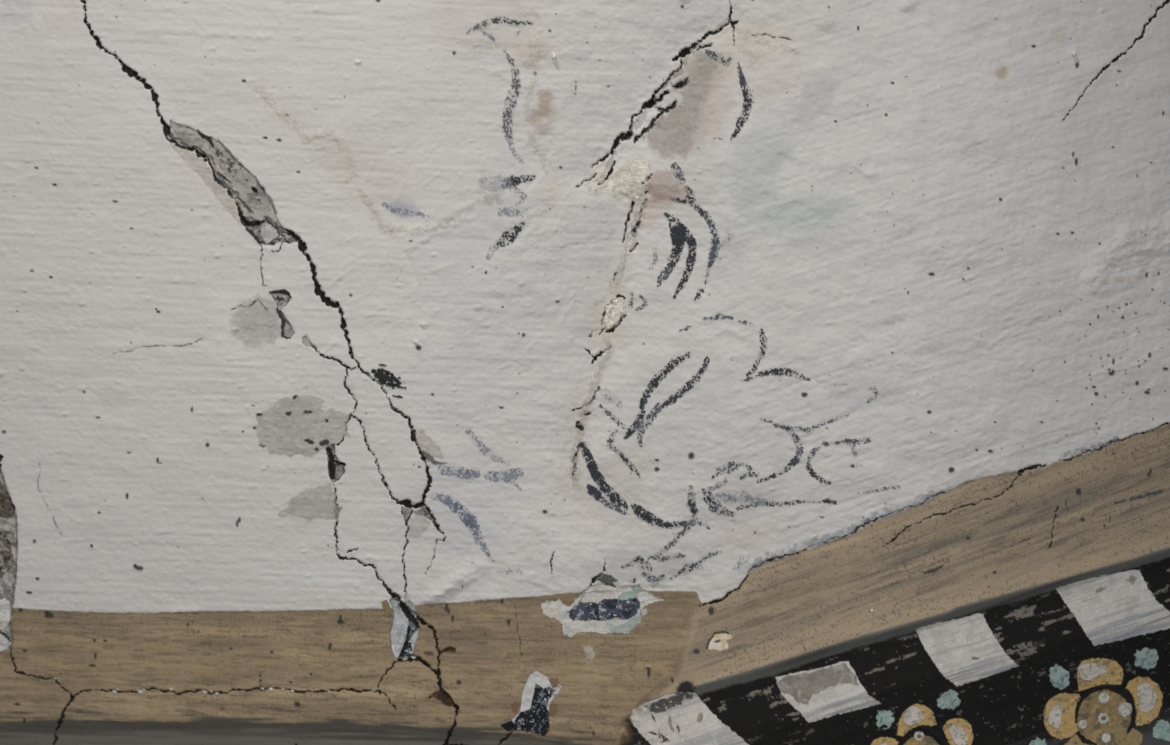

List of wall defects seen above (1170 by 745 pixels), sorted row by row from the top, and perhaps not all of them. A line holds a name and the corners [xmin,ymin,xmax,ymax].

crack [576,0,791,187]
crack [1063,0,1170,120]
spalling [168,120,297,245]
crack [10,0,462,745]
crack [572,173,652,477]
spalling [0,455,18,652]
spalling [381,594,420,661]
peeling [541,573,663,663]
peeling [500,670,562,736]